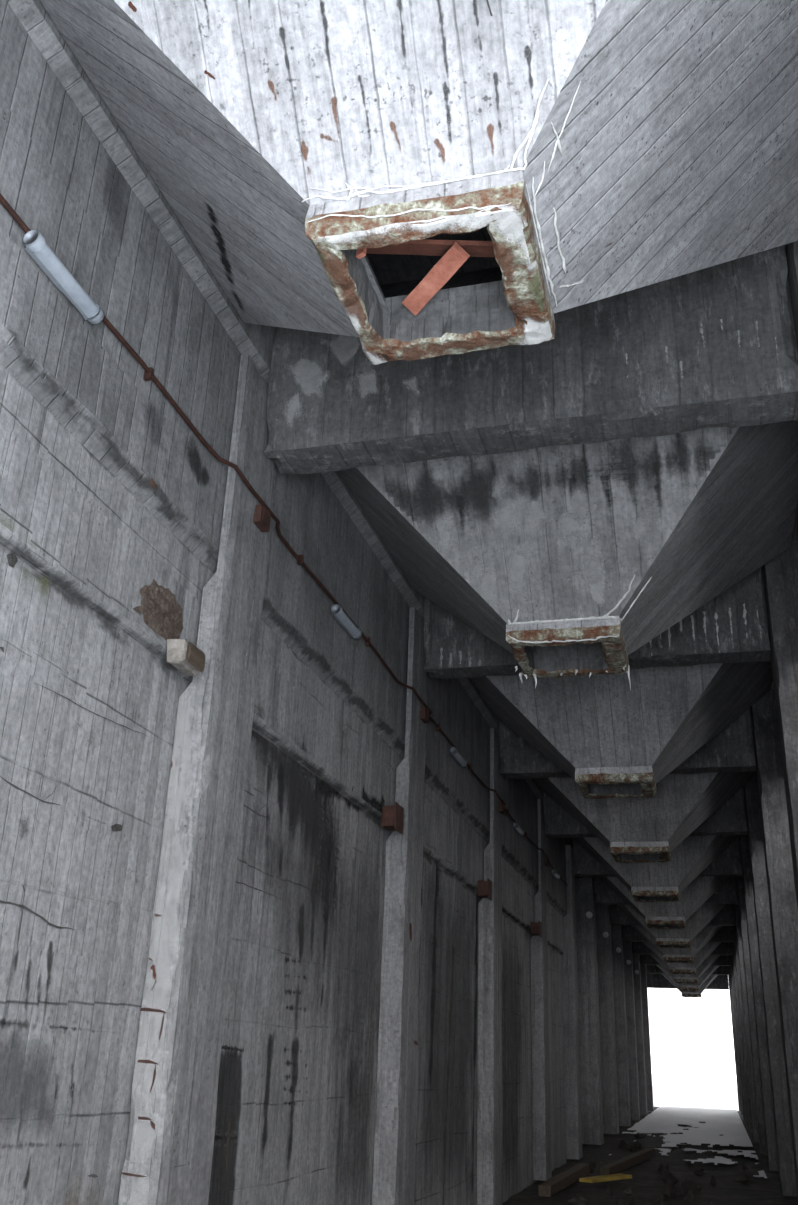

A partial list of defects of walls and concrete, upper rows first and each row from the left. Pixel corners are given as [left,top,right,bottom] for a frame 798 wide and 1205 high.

leakage [321,2,330,64]
leakage [397,0,406,57]
leakage [437,0,451,141]
corrosion [330,257,379,340]
corrosion [402,230,478,316]
corrosion [495,243,522,324]
corrosion [403,333,508,361]
leakage [386,435,714,644]
spalling [133,579,187,640]
leakage [251,729,385,963]
leakage [0,942,52,1028]
leakage [262,976,306,1166]